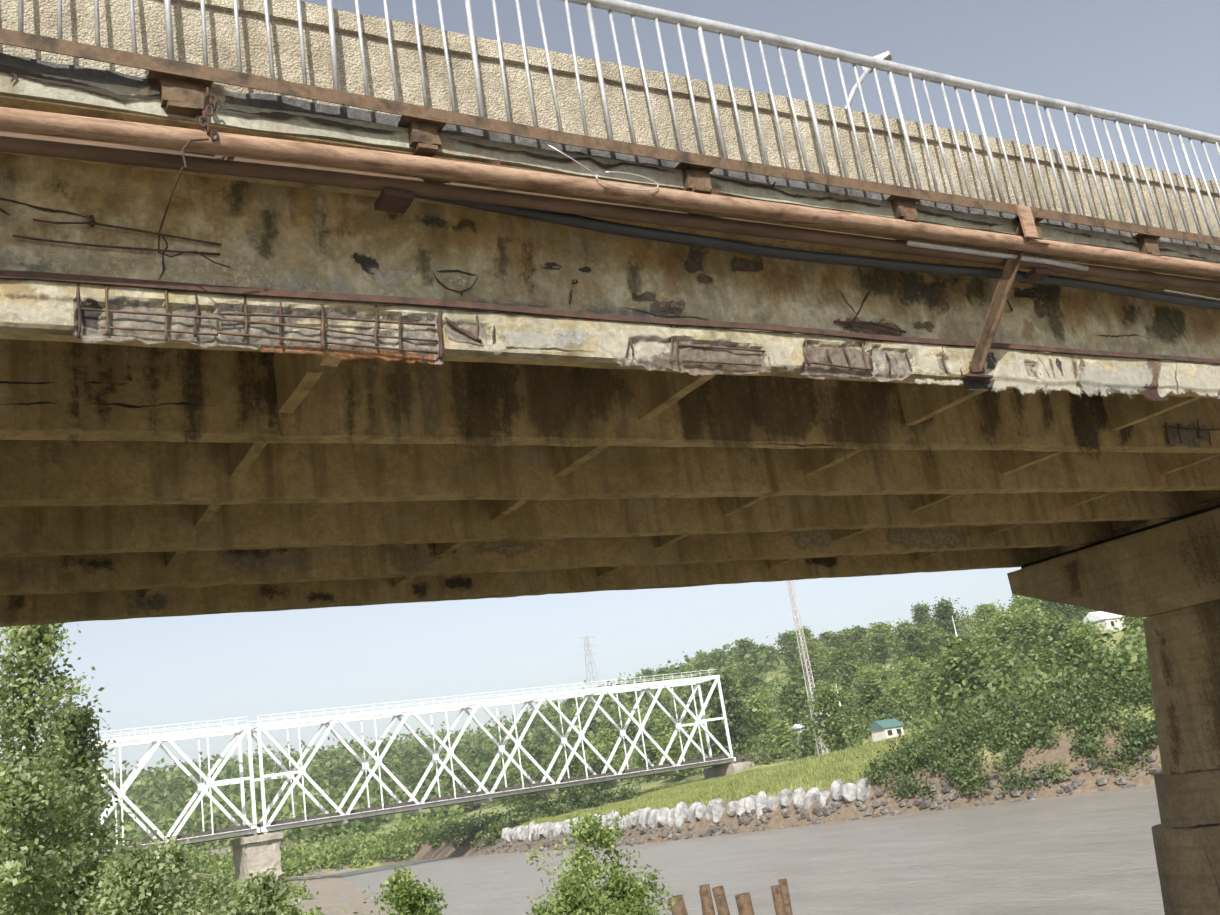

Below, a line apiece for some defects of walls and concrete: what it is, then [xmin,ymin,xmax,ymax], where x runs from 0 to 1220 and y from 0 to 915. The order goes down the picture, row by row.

crack [0,65,161,101]
crack [0,197,89,218]
crack [159,236,168,280]
spalling [0,253,1220,399]
water stain [857,267,987,309]
water stain [1028,283,1064,336]
crack [0,381,55,405]
crack [84,381,209,408]
water stain [238,351,299,435]
water stain [346,357,631,461]
water stain [678,375,936,469]
spalling [1163,420,1220,447]